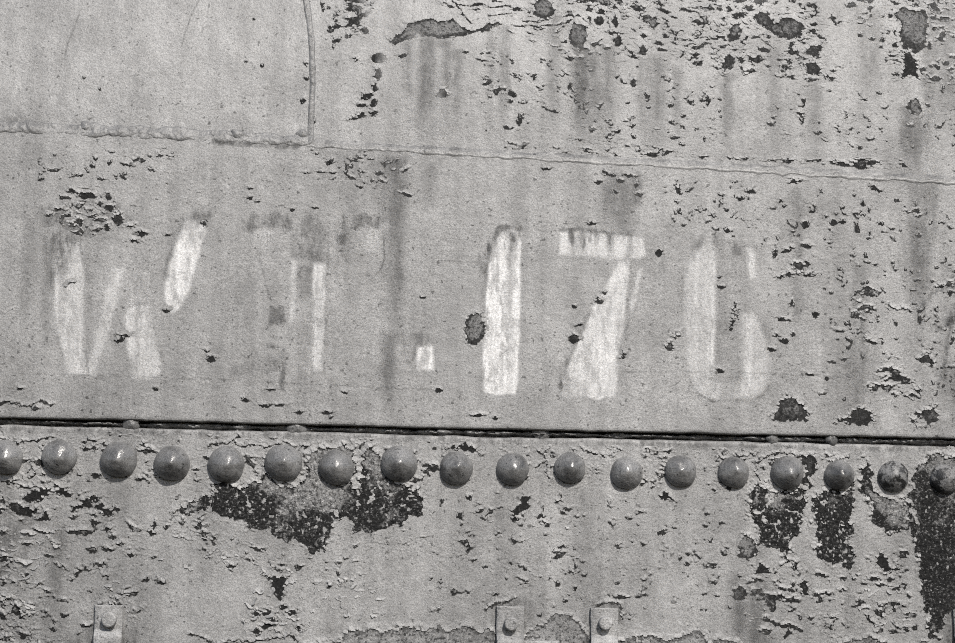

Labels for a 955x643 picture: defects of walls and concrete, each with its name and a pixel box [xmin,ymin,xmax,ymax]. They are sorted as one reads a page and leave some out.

peeling [319,0,376,50]
peeling [299,57,310,105]
peeling [38,145,175,243]
peeling [243,184,263,203]
peeling [299,147,415,197]
peeling [344,0,955,428]
peeling [0,430,955,643]